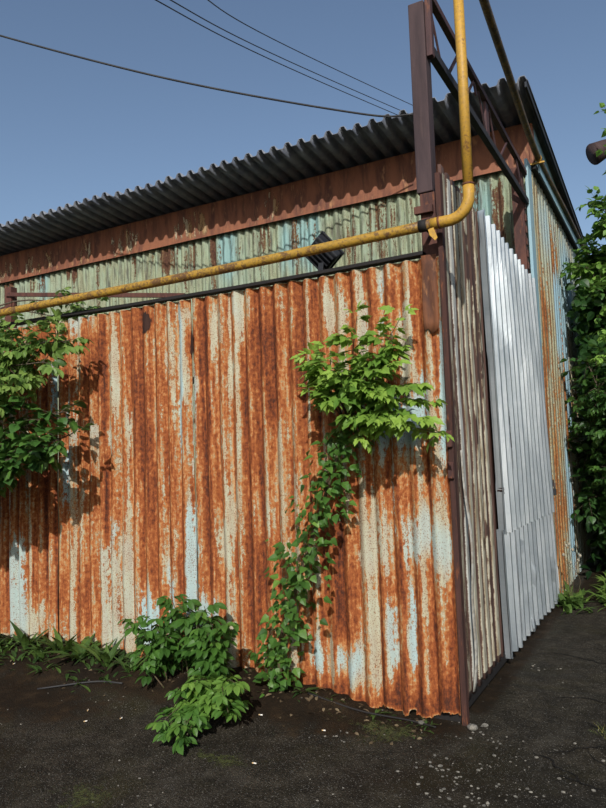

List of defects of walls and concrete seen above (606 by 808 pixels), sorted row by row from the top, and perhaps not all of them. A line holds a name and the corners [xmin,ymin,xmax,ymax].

corrosion [366,198,418,233]
peeling [442,173,463,215]
corrosion [490,176,515,249]
corrosion [533,181,590,593]
corrosion [0,218,461,718]
peeling [445,207,501,692]
crack [533,721,606,791]